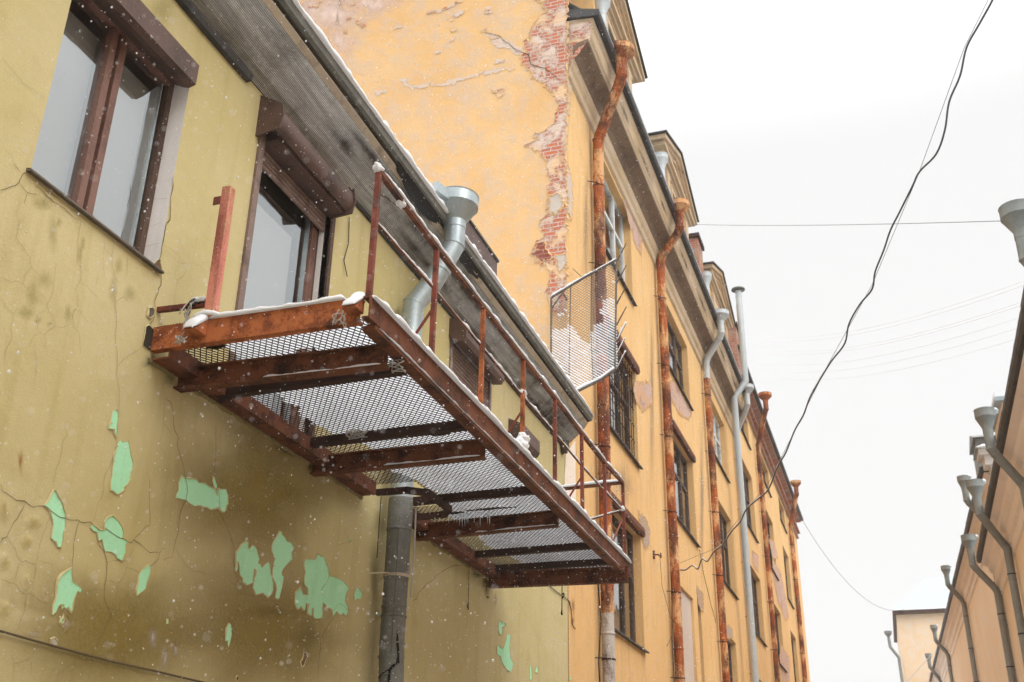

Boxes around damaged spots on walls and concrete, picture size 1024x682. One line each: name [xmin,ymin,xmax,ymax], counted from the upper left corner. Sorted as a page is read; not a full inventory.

crack [483,32,552,74]
flaking render [399,0,587,315]
crack [2,164,142,411]
peeling [108,409,134,496]
peeling [43,488,66,549]
peeling [49,567,82,646]
peeling [90,514,127,562]
crack [1,371,239,656]
peeling [135,564,152,596]
peeling [175,475,229,513]
peeling [235,531,363,619]